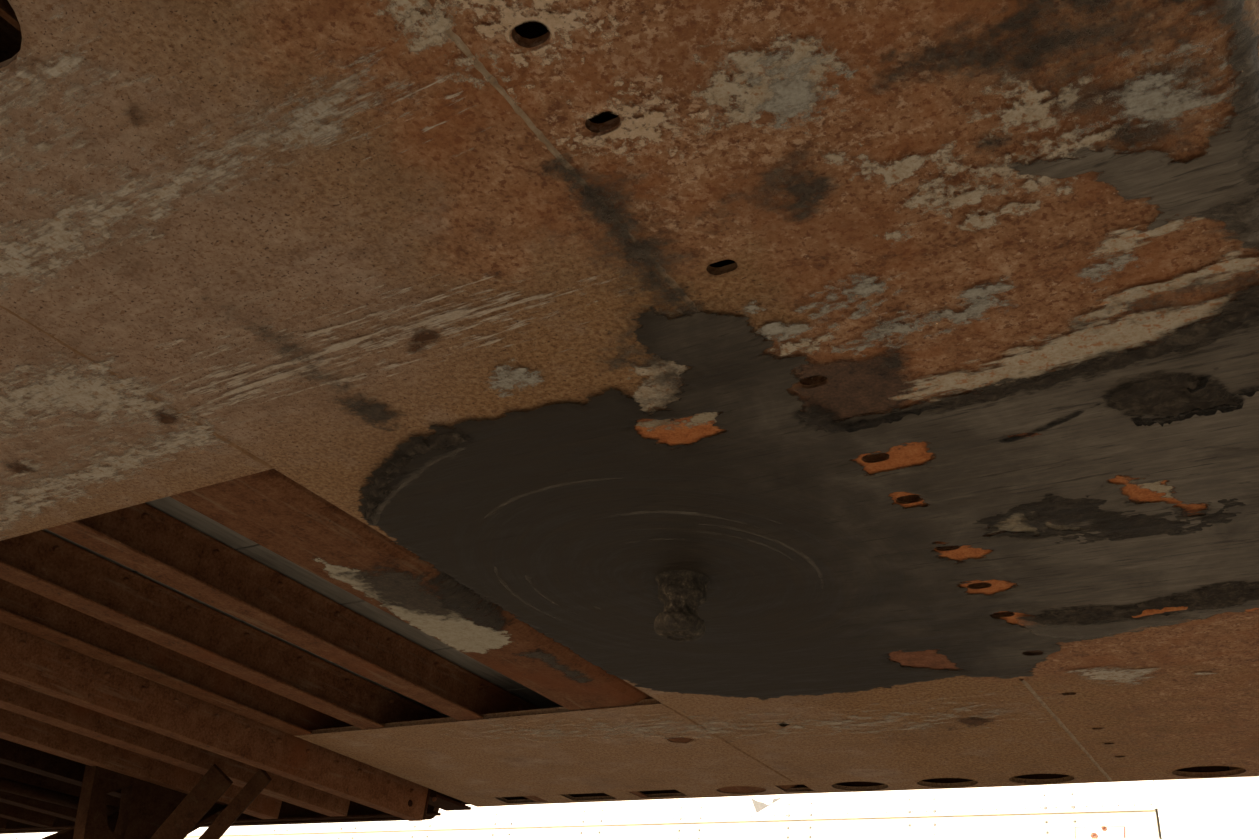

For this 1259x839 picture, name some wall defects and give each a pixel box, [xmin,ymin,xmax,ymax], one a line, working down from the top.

water stain [875,0,1154,92]
water stain [0,53,83,110]
peeling [742,50,857,129]
peeling [957,277,1017,308]
water stain [408,331,439,353]
rust [634,412,723,446]
rust [851,441,934,474]
rust [1108,475,1208,517]
water stain [338,566,457,620]
rust [888,649,964,670]